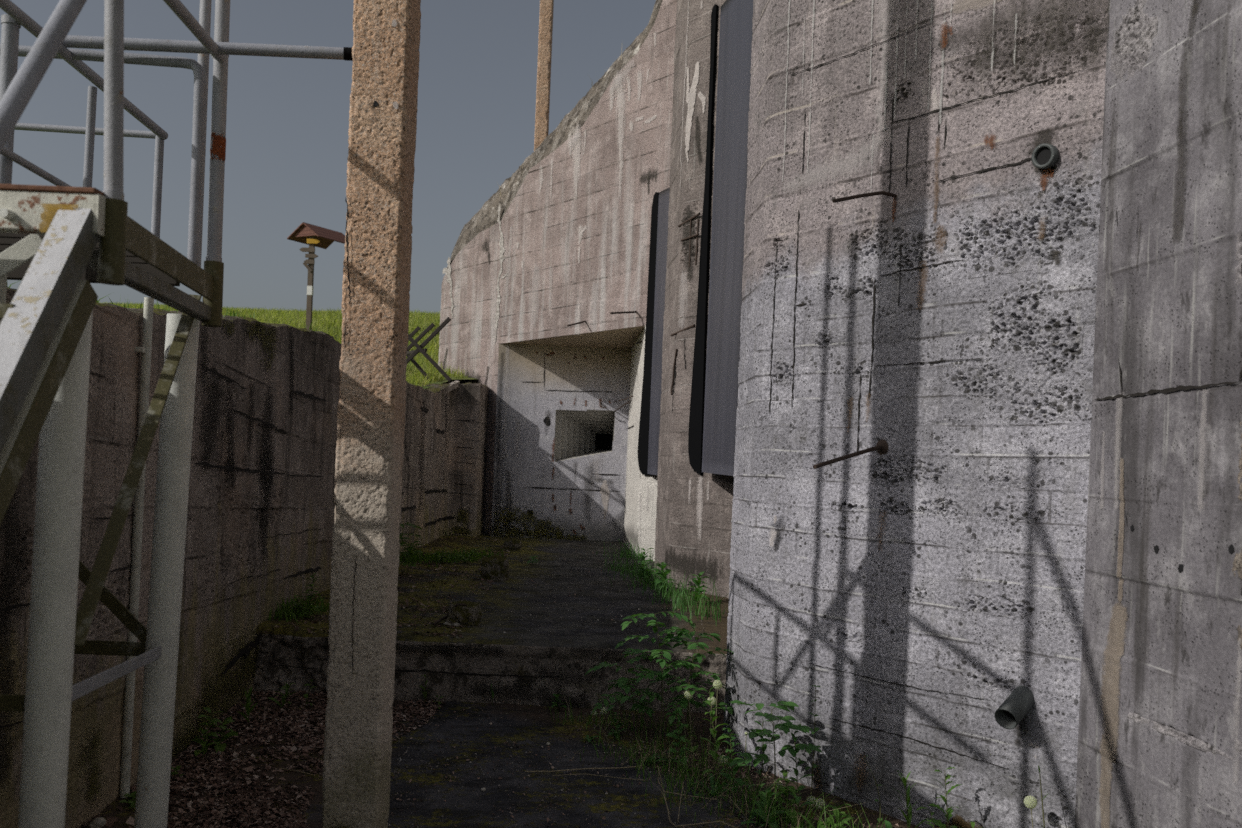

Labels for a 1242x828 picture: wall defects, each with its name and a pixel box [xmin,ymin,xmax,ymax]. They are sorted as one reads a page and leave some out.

rust [1040,168,1054,190]
crack [1094,360,1242,400]
rust [813,446,882,469]